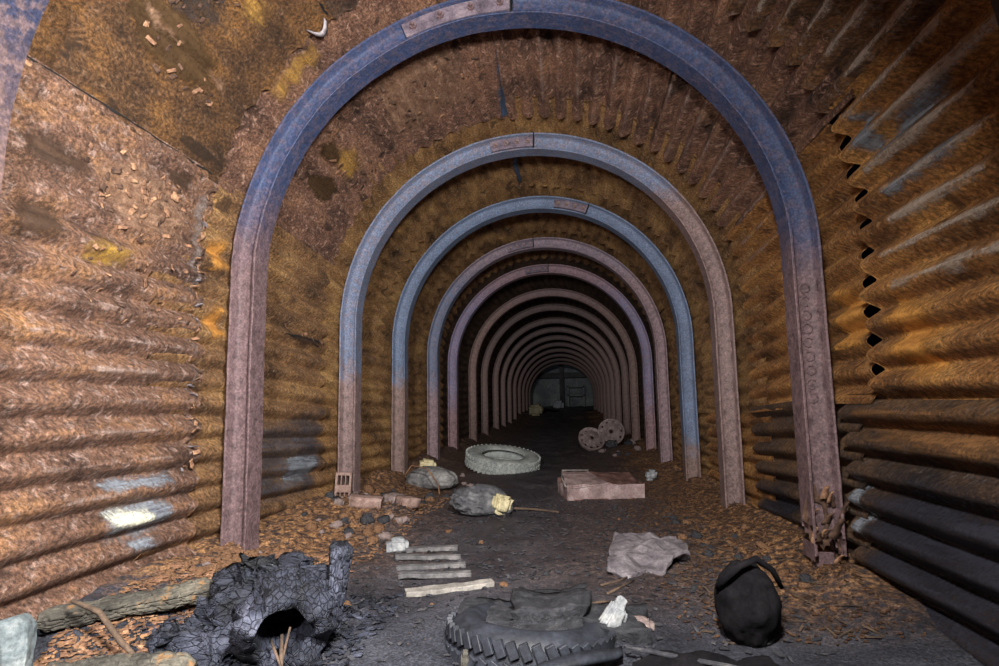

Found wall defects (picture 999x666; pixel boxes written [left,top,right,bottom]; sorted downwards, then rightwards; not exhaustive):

efflorescence [97,475,172,492]
efflorescence [102,499,173,551]
rust [803,484,850,564]